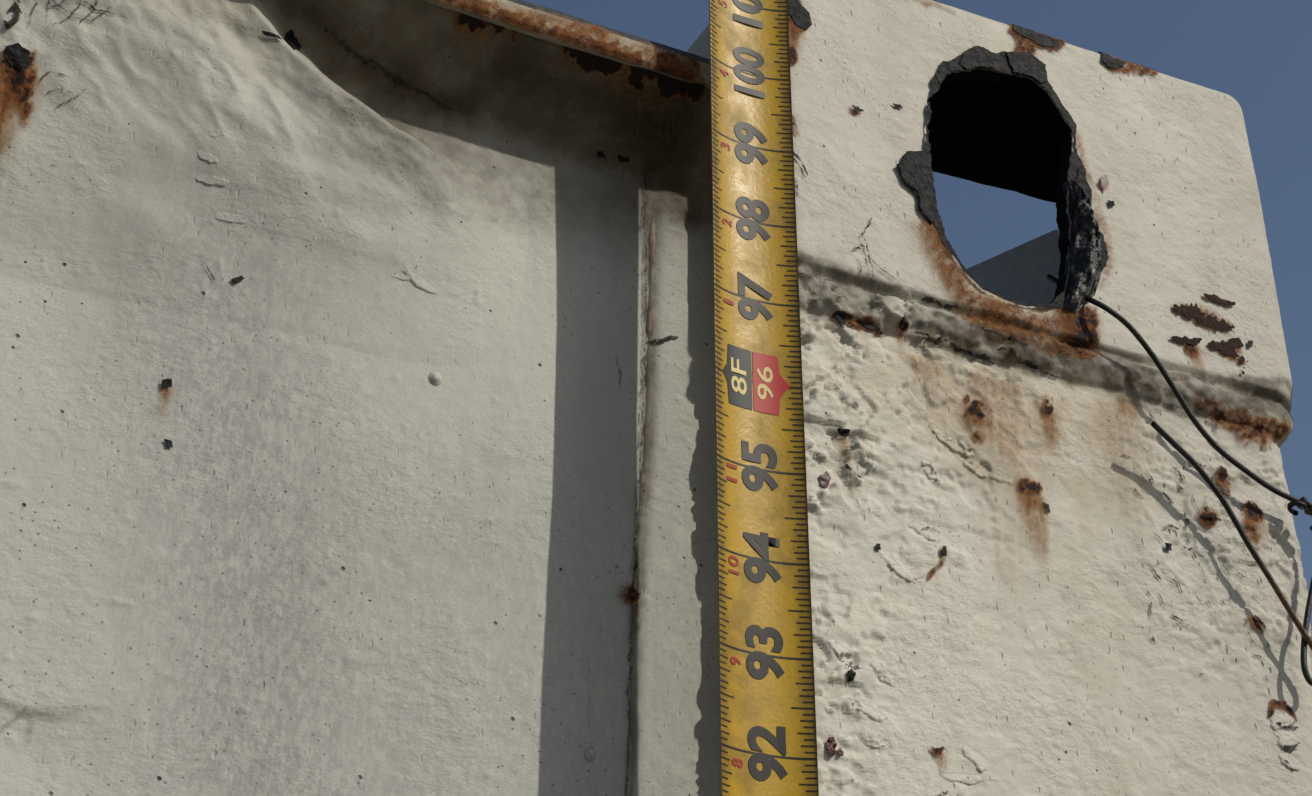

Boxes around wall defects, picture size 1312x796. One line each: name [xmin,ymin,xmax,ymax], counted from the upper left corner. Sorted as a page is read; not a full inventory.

crack [3,0,114,29]
rust [435,0,705,103]
peeling [788,0,812,65]
rust [0,43,37,141]
crack [40,71,85,106]
peeling [896,24,1115,294]
rust [921,222,1100,358]
rust [964,394,988,442]
rust [1019,478,1046,530]
rust [1198,507,1221,528]
rust [1214,466,1231,496]
rust [1243,500,1264,542]